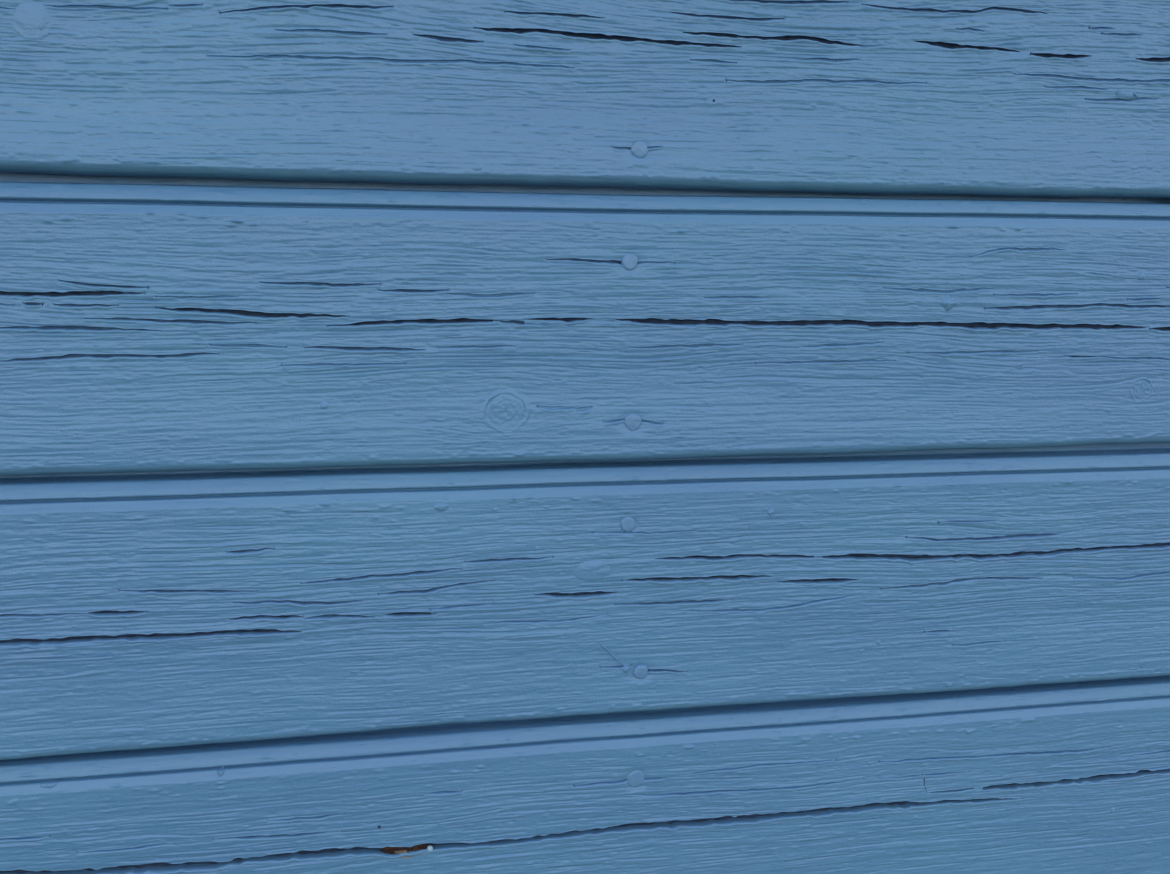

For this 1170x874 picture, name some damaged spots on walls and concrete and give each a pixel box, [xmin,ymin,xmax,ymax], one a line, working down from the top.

crack [44,0,1170,104]
crack [547,257,674,267]
crack [971,246,1064,259]
crack [0,279,1170,369]
crack [0,518,1170,650]
crack [0,746,1170,874]